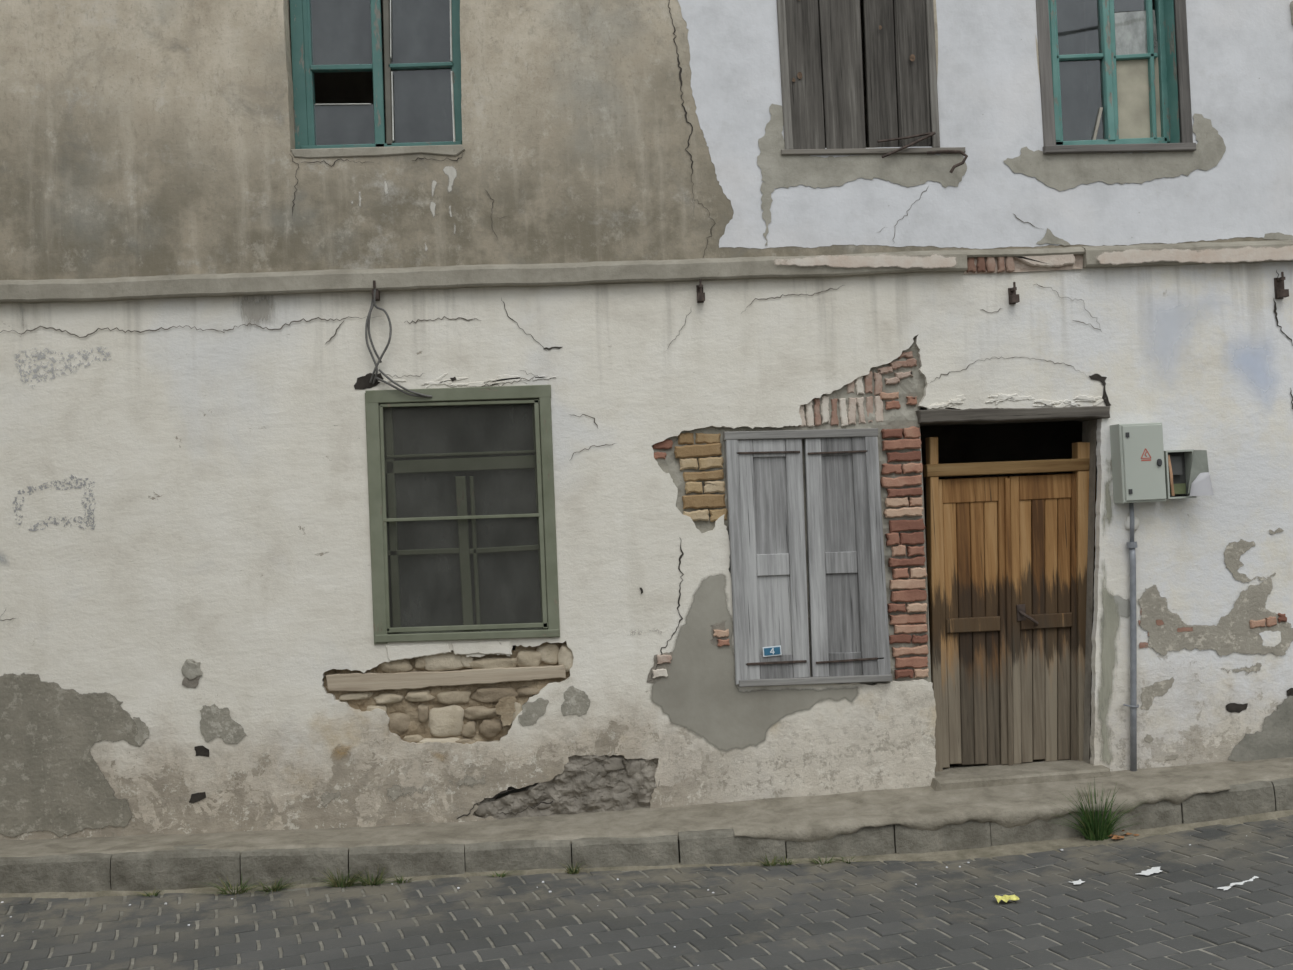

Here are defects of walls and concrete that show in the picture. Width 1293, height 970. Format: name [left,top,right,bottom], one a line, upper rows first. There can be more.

crack [668,0,716,257]
crack [0,298,562,387]
flaking render [652,335,931,685]
crack [651,544,684,678]
flaking render [1138,539,1293,674]
flaking render [0,673,149,837]
flaking render [181,659,203,688]
flaking render [194,704,246,757]
flaking render [323,640,590,744]
flaking render [445,755,660,819]
flaking render [647,652,674,683]
spalling [1226,703,1248,713]